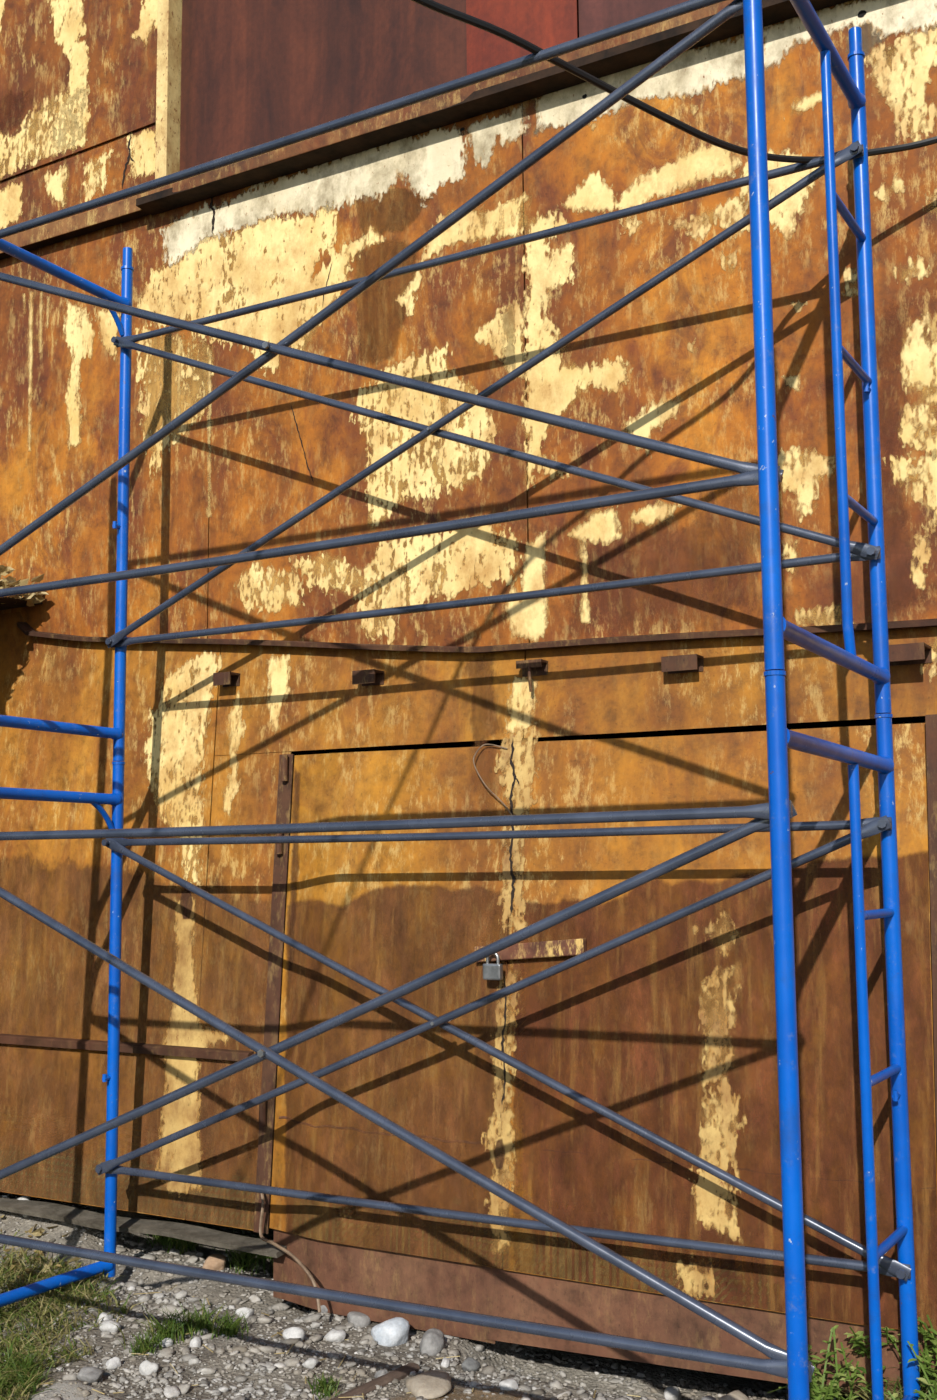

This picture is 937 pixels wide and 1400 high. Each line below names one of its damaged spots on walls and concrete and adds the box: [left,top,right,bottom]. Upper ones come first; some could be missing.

peeling [0,0,158,230]
corrosion [356,189,424,362]
peeling [135,34,750,517]
peeling [767,148,821,240]
peeling [763,0,937,143]
peeling [234,343,548,645]
peeling [883,312,937,589]
peeling [144,650,228,1198]
corrosion [180,889,193,919]
corrosion [289,843,298,969]
crack [509,741,519,916]
corrosion [494,1139,505,1169]